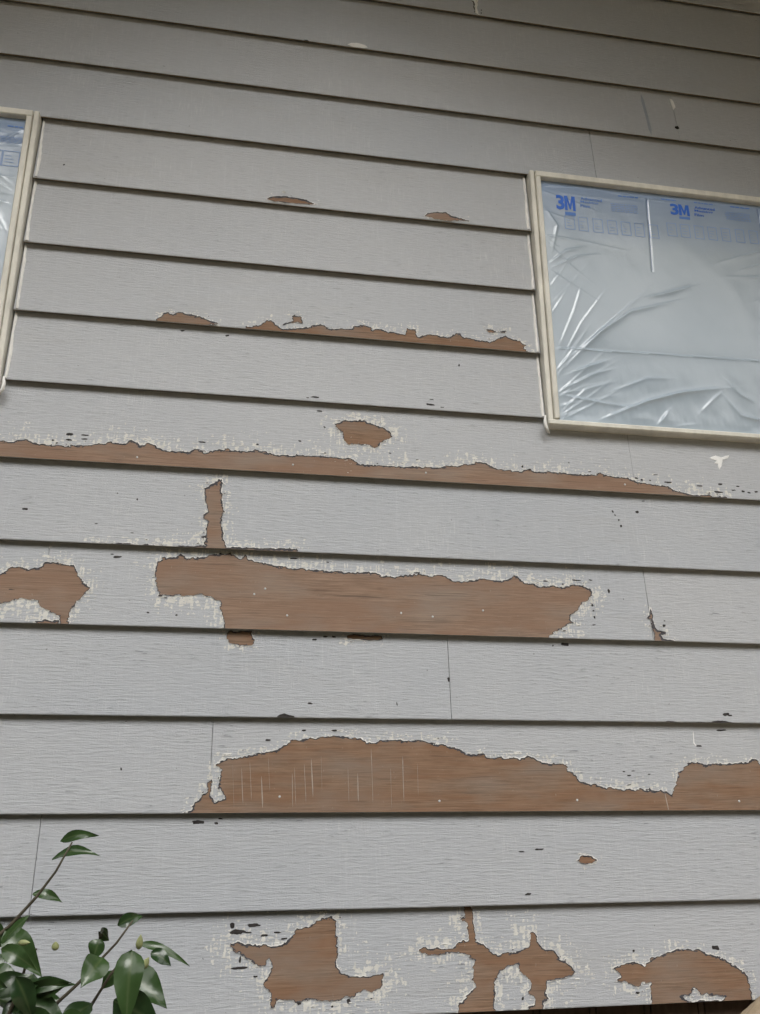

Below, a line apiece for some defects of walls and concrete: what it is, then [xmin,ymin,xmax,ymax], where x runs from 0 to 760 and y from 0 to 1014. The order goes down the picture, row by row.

crack [472,0,482,15]
peeling [266,191,319,205]
peeling [424,209,470,222]
peeling [155,306,536,353]
peeling [0,409,758,652]
peeling [181,729,760,824]
peeling [204,906,759,1014]